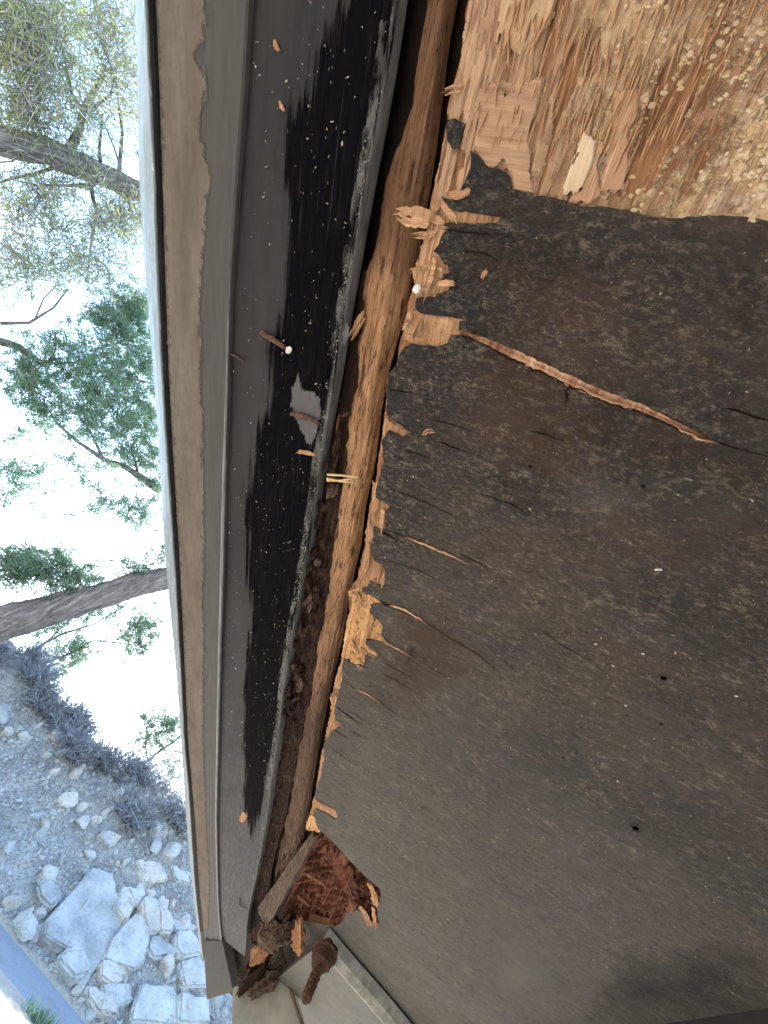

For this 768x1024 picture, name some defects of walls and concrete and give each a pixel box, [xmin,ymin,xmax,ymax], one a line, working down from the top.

peeling [350,85,379,213]
peeling [392,0,768,346]
peeling [333,288,350,346]
peeling [379,412,410,456]
crack [455,329,768,457]
peeling [246,373,341,913]
peeling [306,481,389,832]
peeling [328,844,379,929]